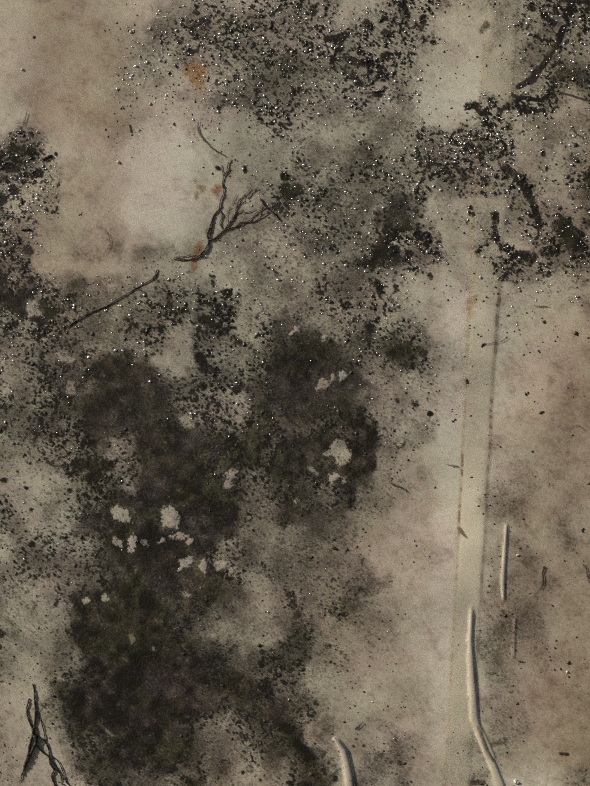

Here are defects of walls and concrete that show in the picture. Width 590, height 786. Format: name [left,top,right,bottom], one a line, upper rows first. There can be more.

crack [197,122,226,157]
damp [349,725,416,786]